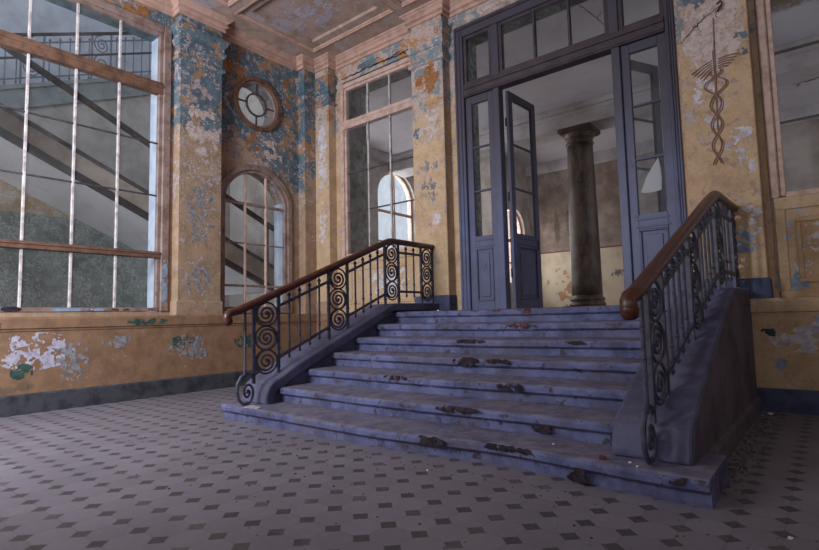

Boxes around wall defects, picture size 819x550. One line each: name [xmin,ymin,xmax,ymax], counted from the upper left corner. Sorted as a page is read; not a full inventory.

crack [679,5,724,44]
crack [341,49,408,80]
peeling [415,63,439,93]
peeling [681,0,748,128]
peeling [186,105,219,165]
peeling [246,132,284,167]
peeling [318,125,327,191]
peeling [724,125,758,173]
peeling [1,332,89,381]
spalling [452,357,510,366]
spalling [418,435,445,447]
spalling [484,443,533,455]